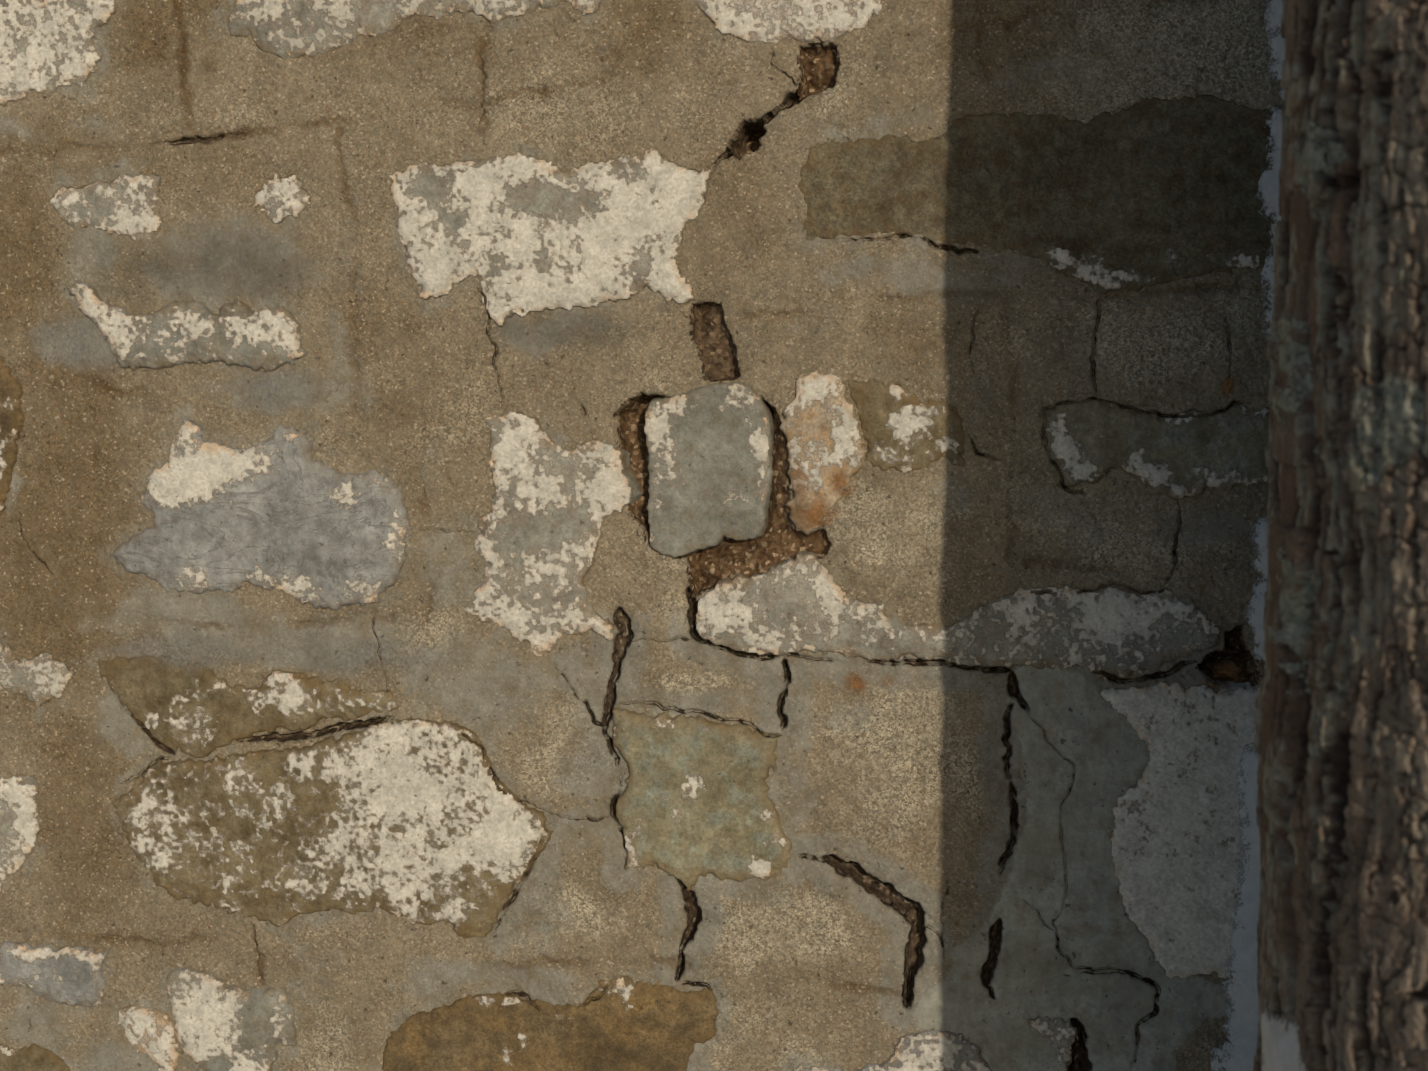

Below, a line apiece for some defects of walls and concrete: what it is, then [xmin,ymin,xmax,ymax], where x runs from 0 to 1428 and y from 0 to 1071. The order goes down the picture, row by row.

crack [699,53,807,173]
crack [238,615,393,742]
crack [120,706,175,784]
crack [455,587,1161,1071]